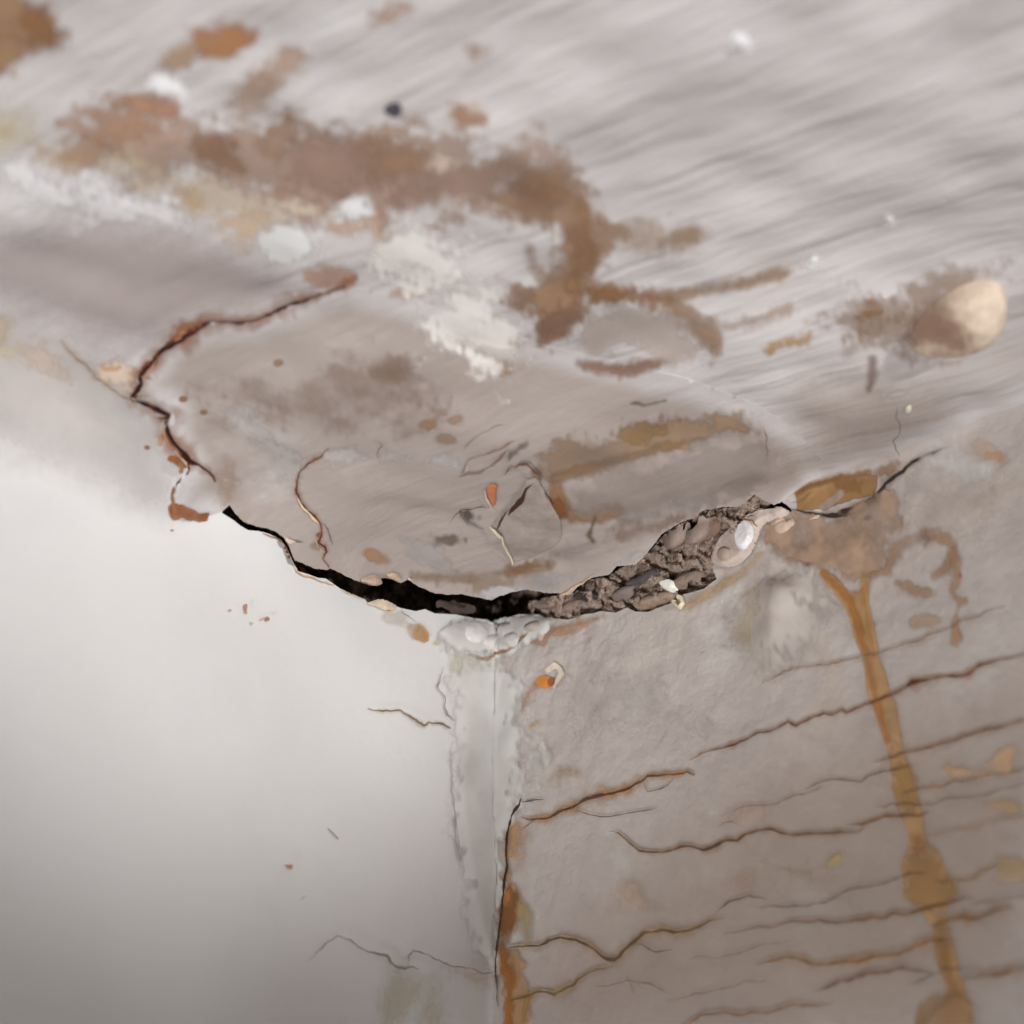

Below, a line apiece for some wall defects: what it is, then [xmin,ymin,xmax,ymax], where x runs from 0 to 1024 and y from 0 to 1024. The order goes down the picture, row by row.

damp [56,46,788,352]
damp [0,241,260,326]
crack [109,286,345,487]
damp [580,359,668,376]
damp [839,272,973,343]
crack [295,449,334,569]
spalling [222,489,903,622]
rust [796,464,894,511]
crack [791,439,950,518]
crack [310,654,1024,1024]
rust [820,569,973,1024]